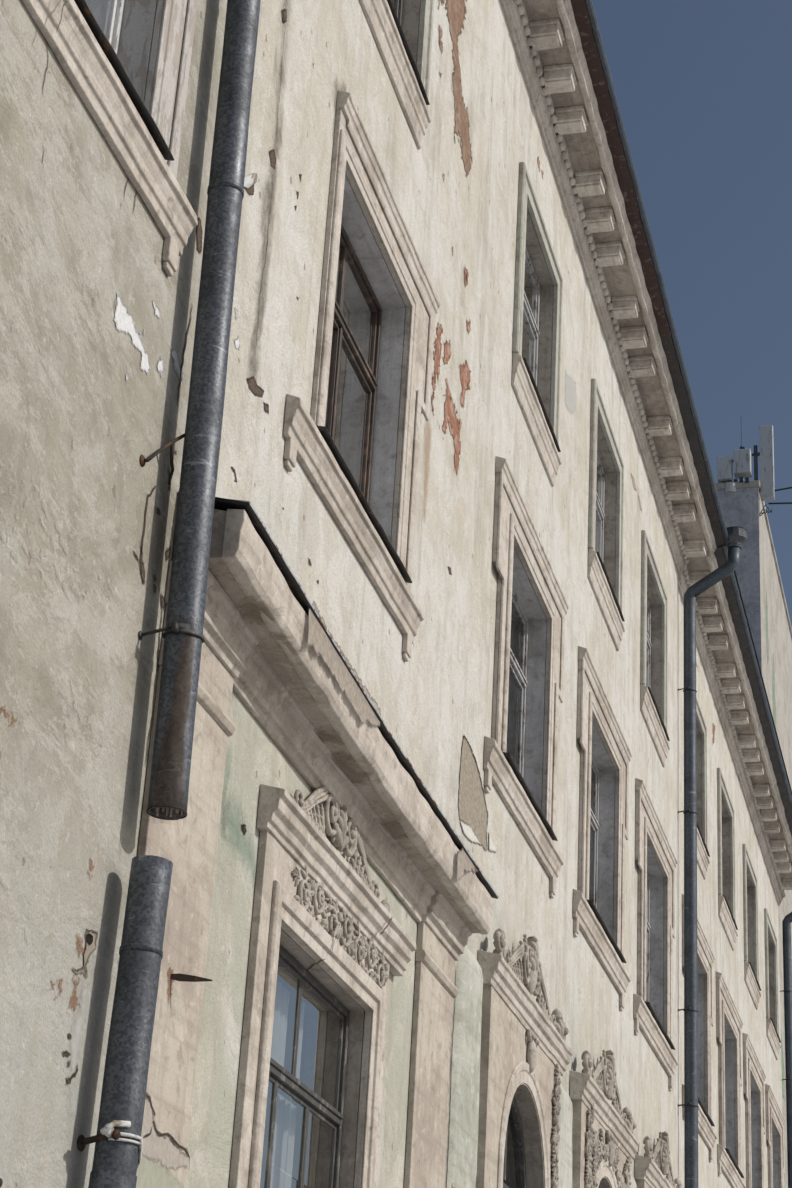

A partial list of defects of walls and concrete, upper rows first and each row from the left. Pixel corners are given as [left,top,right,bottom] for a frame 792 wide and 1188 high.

flaking render [438,0,473,177]
peeling [114,293,184,381]
crack [177,308,192,404]
flaking render [431,323,471,473]
crack [133,464,171,761]
flaking render [458,736,498,852]
rust [51,978,80,1011]
crack [141,1090,191,1171]